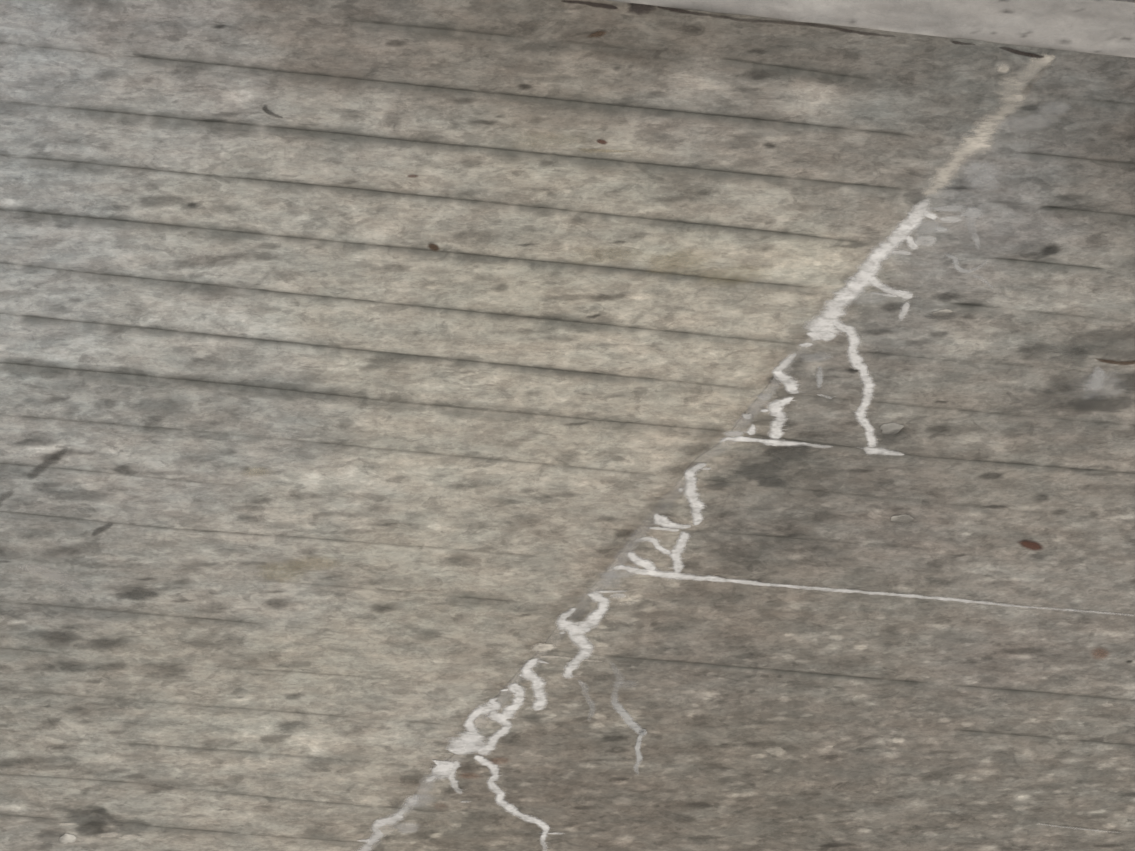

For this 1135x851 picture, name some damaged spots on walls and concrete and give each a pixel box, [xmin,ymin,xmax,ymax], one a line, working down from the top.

leakage [720,114,1002,455]
leakage [613,464,994,604]
efflorescence [557,591,611,678]
efflorescence [427,643,557,842]
leakage [613,701,647,761]
leakage [359,815,403,849]